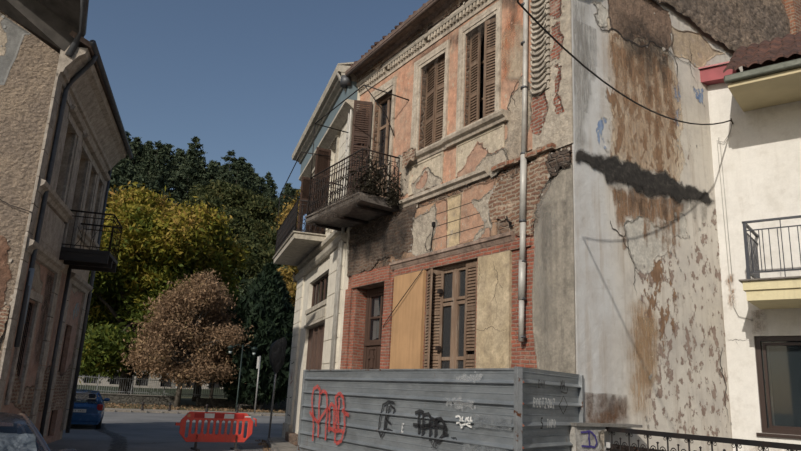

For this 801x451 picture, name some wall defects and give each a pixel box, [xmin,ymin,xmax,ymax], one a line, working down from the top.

spalling [457,0,571,241]
leakage [573,5,593,115]
leakage [575,129,714,205]
peeling [593,0,732,181]
spalling [0,235,13,337]
crack [610,221,640,292]
peeling [624,209,732,437]